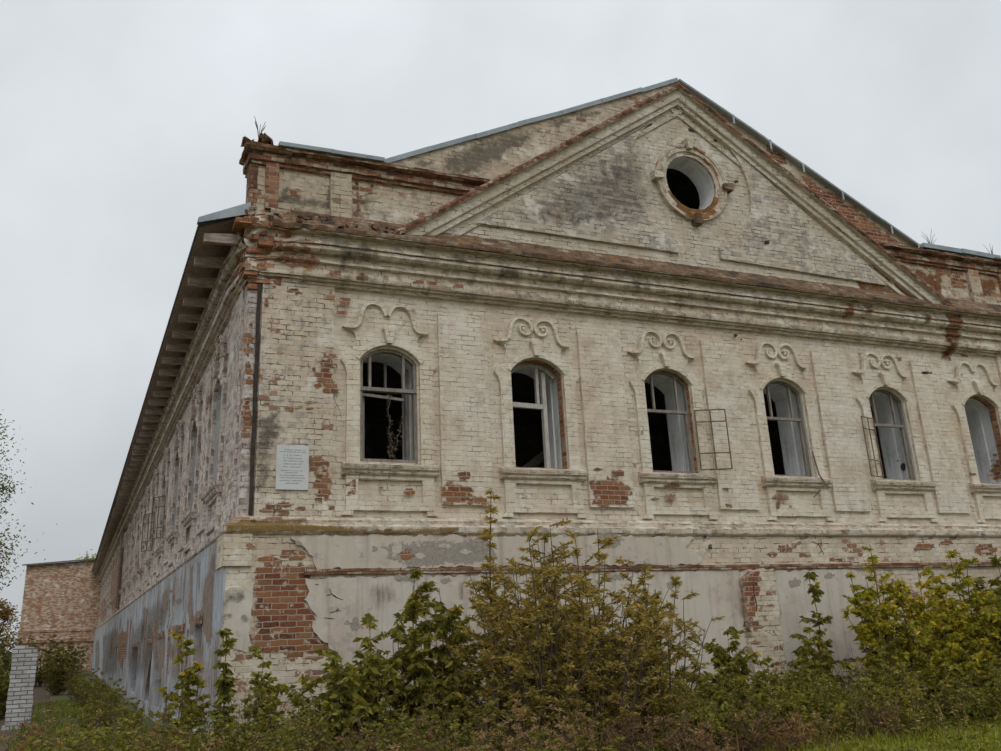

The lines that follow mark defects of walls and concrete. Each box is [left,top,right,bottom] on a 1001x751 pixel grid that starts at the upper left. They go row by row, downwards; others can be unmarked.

spalling [803,176,900,245]
peeling [920,265,967,289]
peeling [312,353,339,394]
peeling [259,502,306,513]
peeling [309,455,335,510]
peeling [441,472,489,507]
peeling [589,468,632,508]
peeling [372,537,497,582]
peeling [109,565,216,692]
spalling [248,541,329,662]
spalling [741,570,774,645]